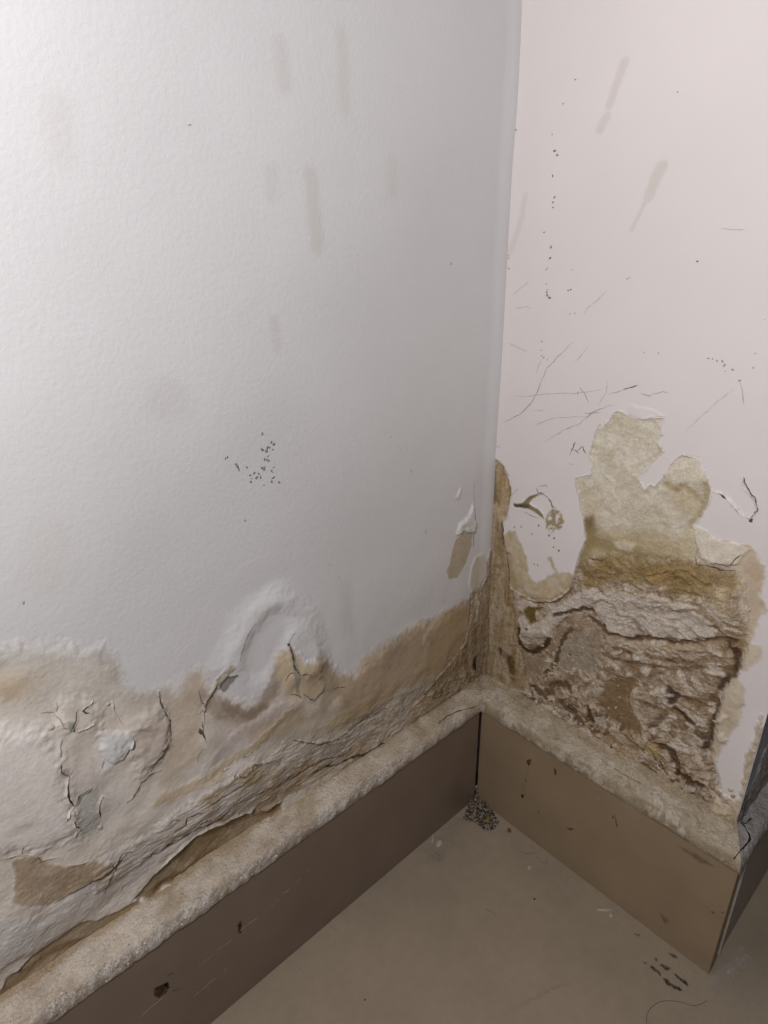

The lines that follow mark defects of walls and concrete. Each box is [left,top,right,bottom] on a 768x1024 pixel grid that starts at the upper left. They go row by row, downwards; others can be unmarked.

leakage [225,432,280,486]
crack [496,342,670,465]
crack [54,691,392,904]
leakage [0,575,471,989]
crack [286,633,345,703]
spalling [0,401,768,995]